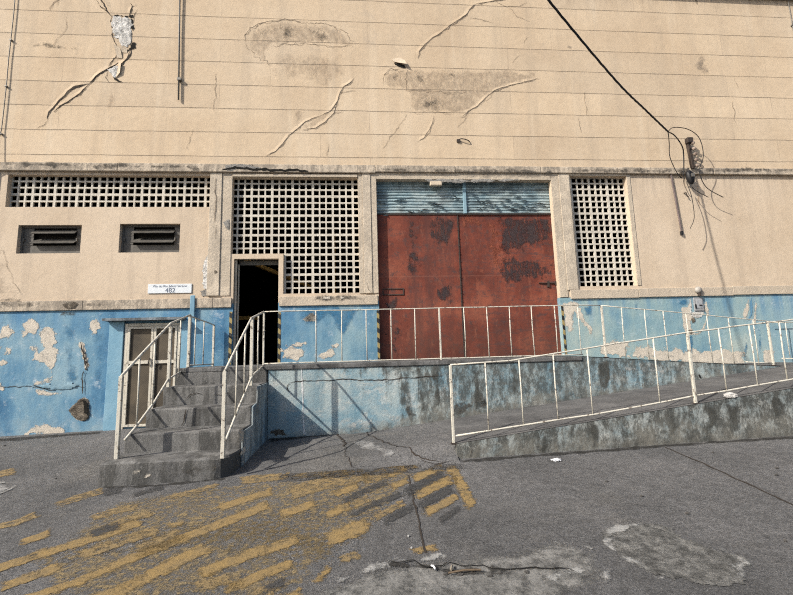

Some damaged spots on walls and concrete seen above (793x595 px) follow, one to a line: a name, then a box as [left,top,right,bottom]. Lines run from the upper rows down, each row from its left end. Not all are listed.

crack [39,0,137,127]
crack [264,77,354,156]
peeling [0,318,61,396]
peeling [600,340,748,364]
spalling [69,342,90,421]
crack [287,375,442,392]
water stain [599,361,610,387]
water stain [454,384,486,414]
peeling [24,423,64,435]
water stain [704,407,717,429]
water stain [728,405,738,430]
crack [390,559,574,572]